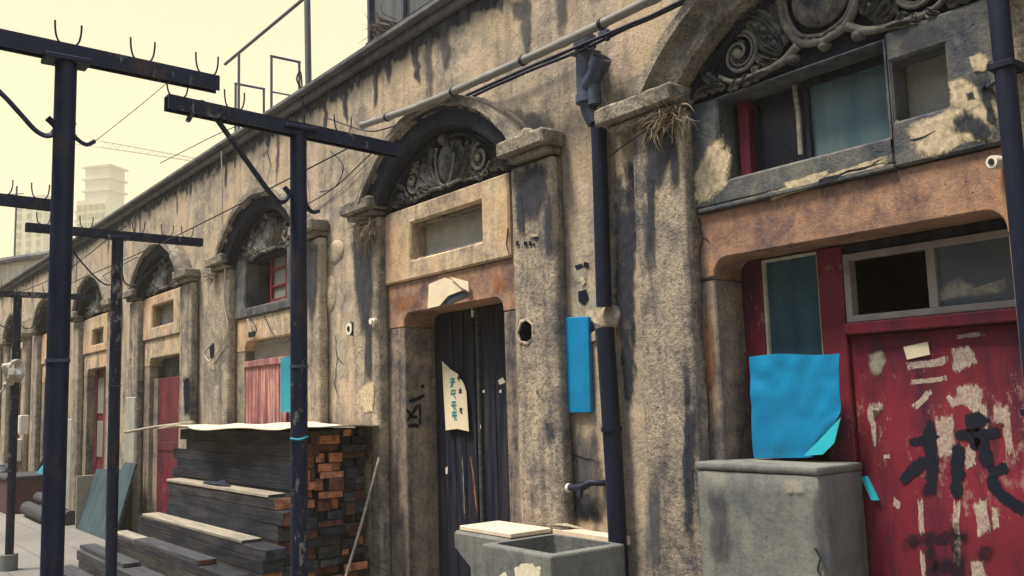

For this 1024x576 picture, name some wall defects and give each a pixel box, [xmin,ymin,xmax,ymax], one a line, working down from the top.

damp [556,0,566,32]
damp [284,0,530,127]
damp [508,109,545,130]
peeling [908,52,998,157]
damp [72,132,279,276]
damp [515,164,552,254]
peeling [694,139,731,204]
peeling [770,157,888,200]
crack [818,159,886,183]
damp [613,124,678,409]
peeling [950,384,986,413]
damp [645,483,659,567]